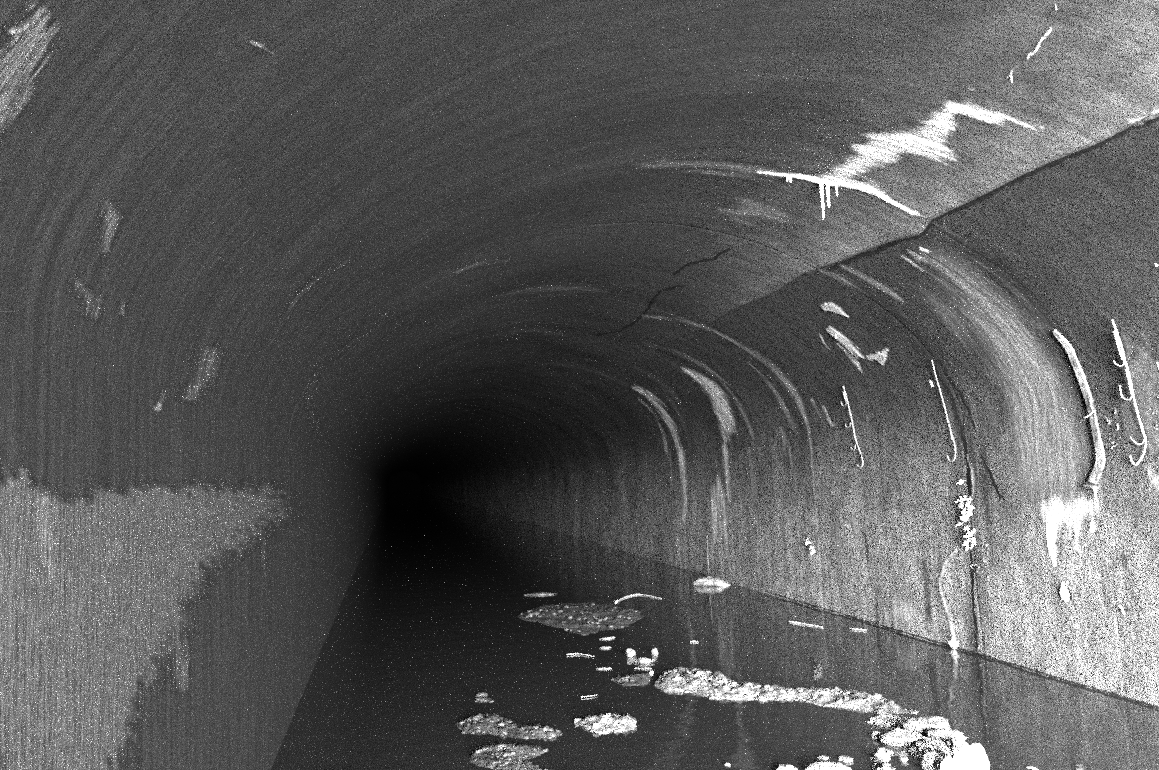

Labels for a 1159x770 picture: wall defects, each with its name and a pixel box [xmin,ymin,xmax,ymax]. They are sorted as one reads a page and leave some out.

leakage [653,104,1022,214]
crack [825,117,1159,272]
leakage [908,248,1098,557]